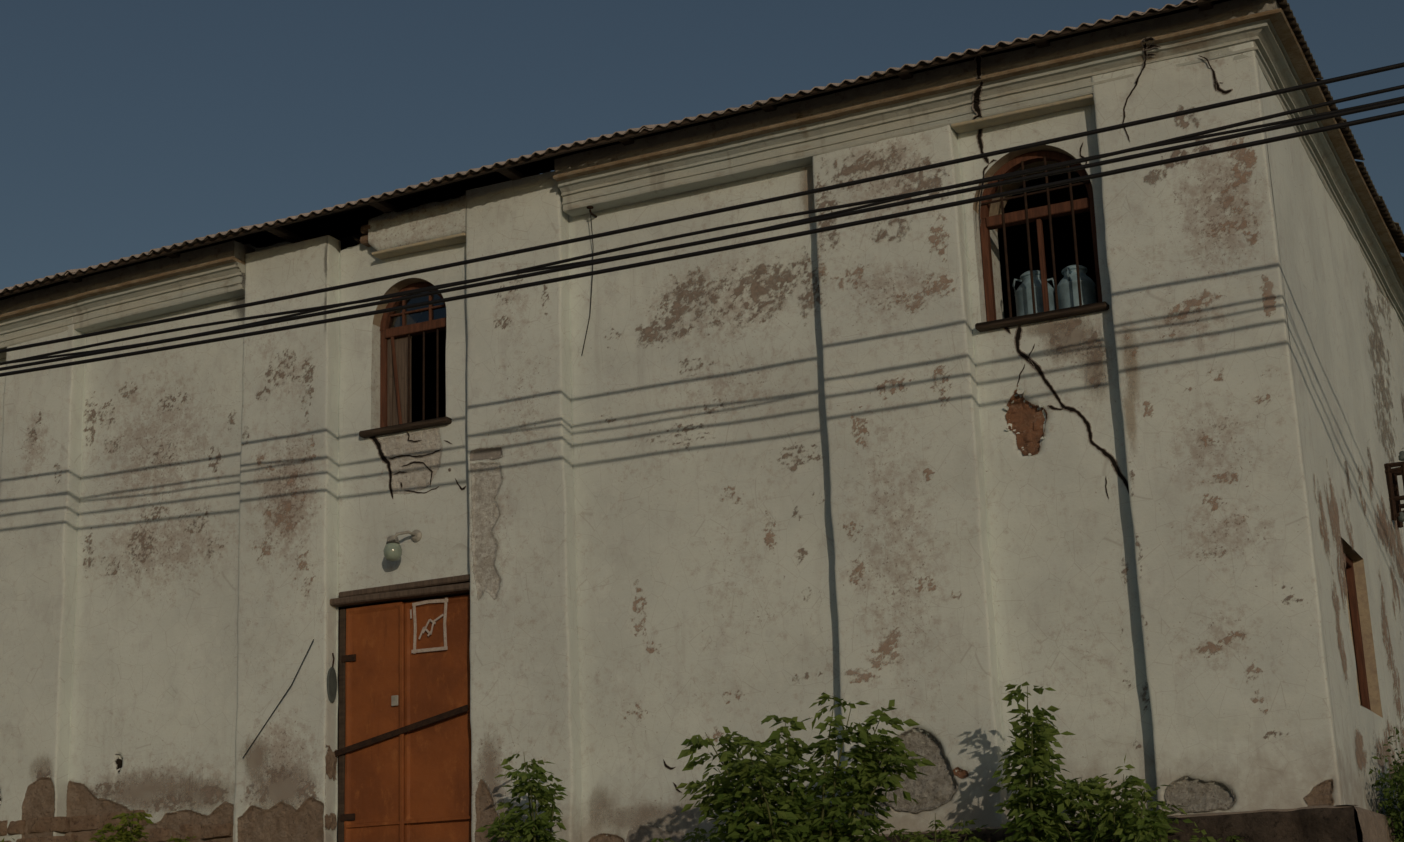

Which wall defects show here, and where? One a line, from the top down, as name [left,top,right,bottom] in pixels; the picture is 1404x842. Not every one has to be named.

crack [1122,36,1161,142]
crack [1198,55,1233,95]
crack [972,56,997,225]
flaking render [605,145,955,348]
crack [369,431,466,499]
flaking render [470,447,503,461]
flaking render [779,444,820,471]
spalling [1004,385,1048,456]
crack [1003,325,1129,499]
flaking render [0,745,337,842]
spalling [874,728,969,813]
spalling [1165,776,1236,813]